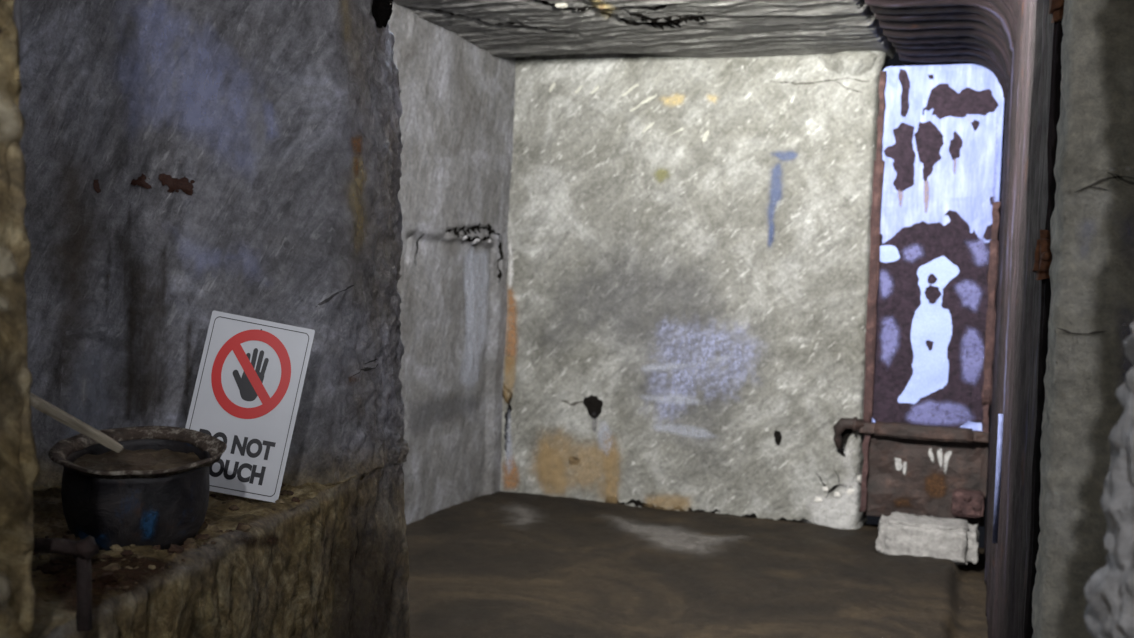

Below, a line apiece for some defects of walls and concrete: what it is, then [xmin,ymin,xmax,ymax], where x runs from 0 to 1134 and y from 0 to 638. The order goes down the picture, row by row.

crack [410,0,707,31]